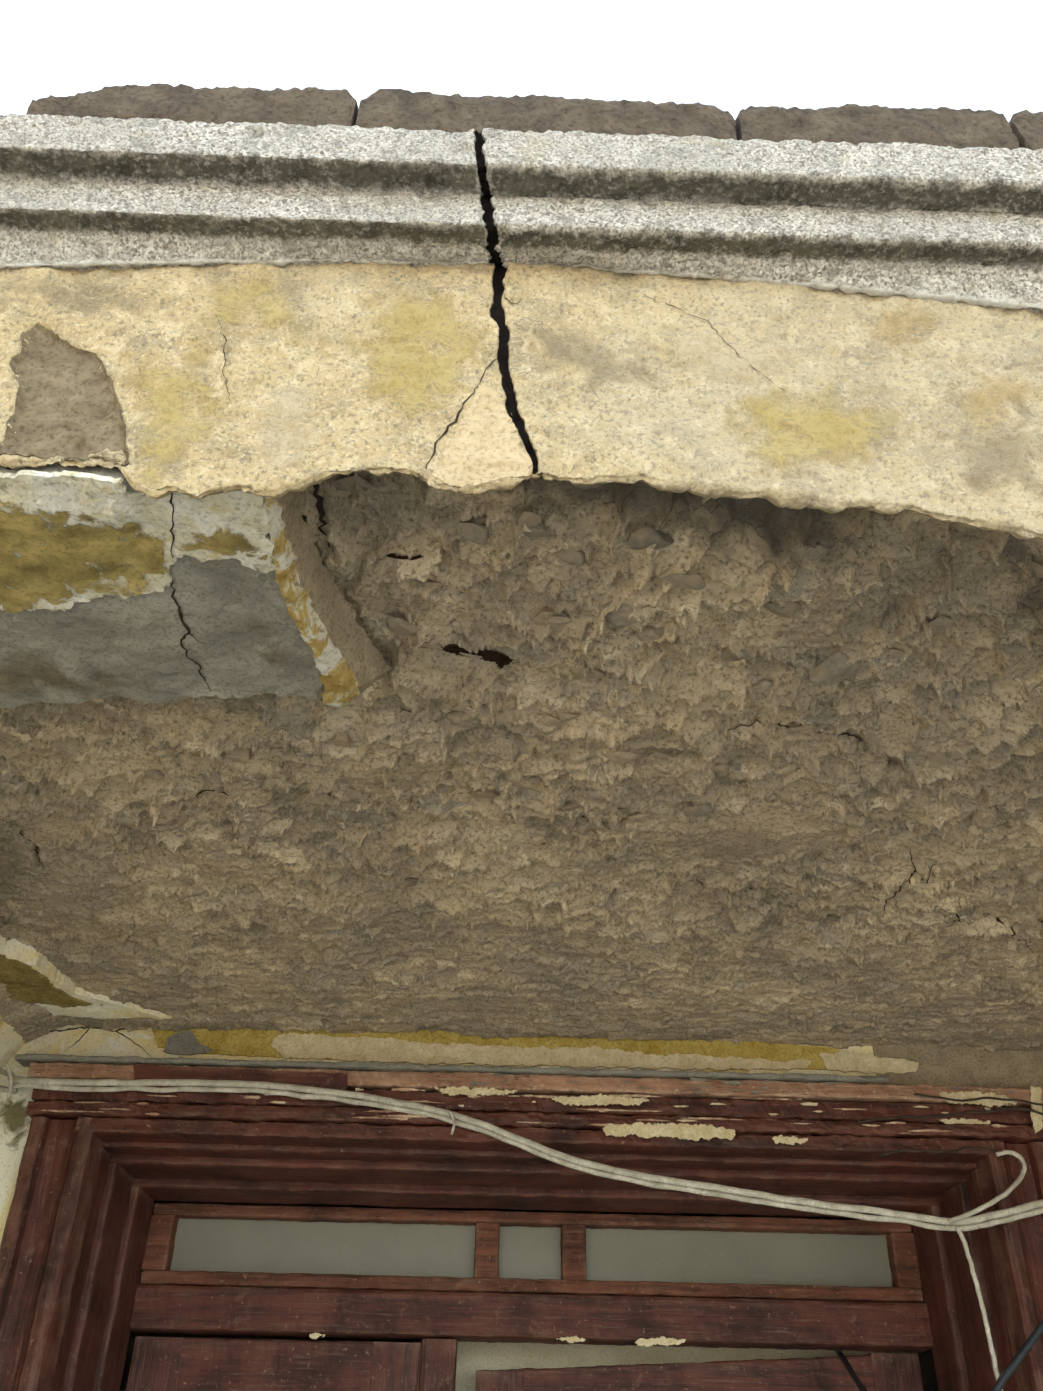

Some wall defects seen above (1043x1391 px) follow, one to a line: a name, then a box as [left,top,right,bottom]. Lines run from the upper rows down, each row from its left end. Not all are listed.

spalling [0,323,129,466]
crack [425,130,538,472]
crack [169,493,211,691]
crack [313,484,330,546]
flaking render [0,472,1043,1145]